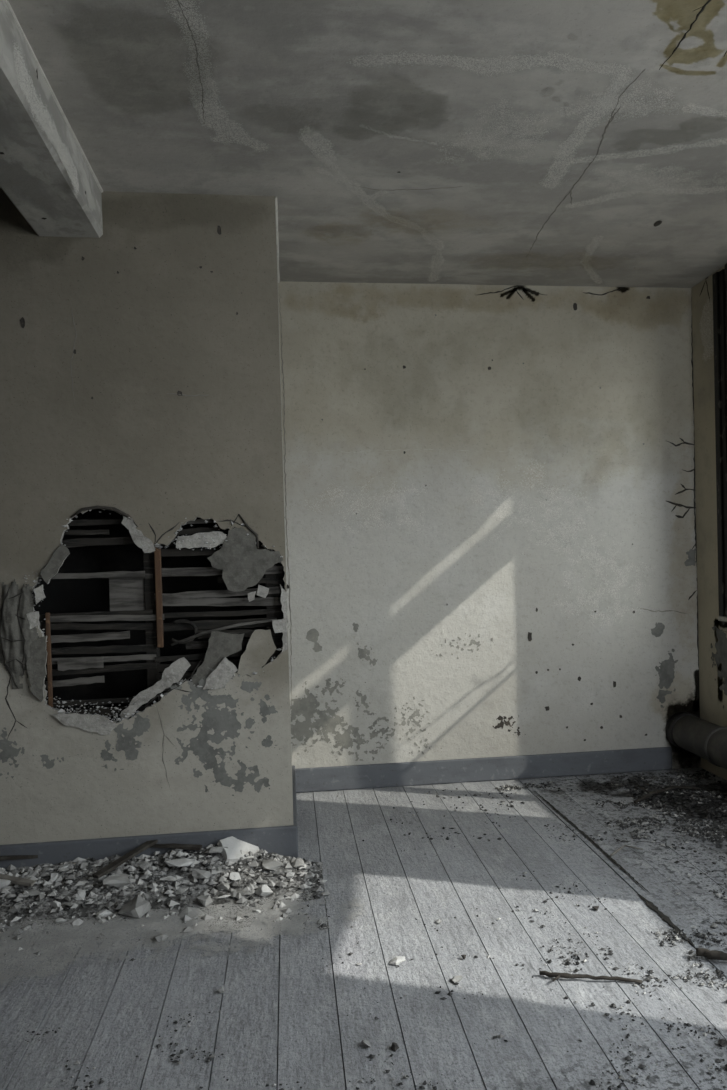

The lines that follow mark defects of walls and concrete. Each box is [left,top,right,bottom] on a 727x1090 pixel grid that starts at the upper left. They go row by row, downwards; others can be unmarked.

crack [526,0,711,258]
crack [478,285,543,300]
crack [691,277,710,411]
crack [666,438,697,561]
spalling [24,505,442,796]
peeling [655,649,678,708]
crack [640,590,699,667]
peeling [0,727,64,779]